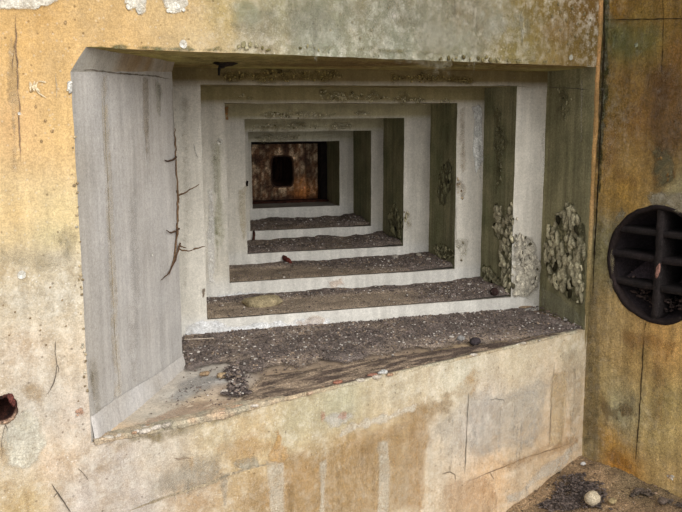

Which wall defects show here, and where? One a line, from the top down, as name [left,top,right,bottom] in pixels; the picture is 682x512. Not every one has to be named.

crack [12,16,21,162]
crack [635,323,646,460]